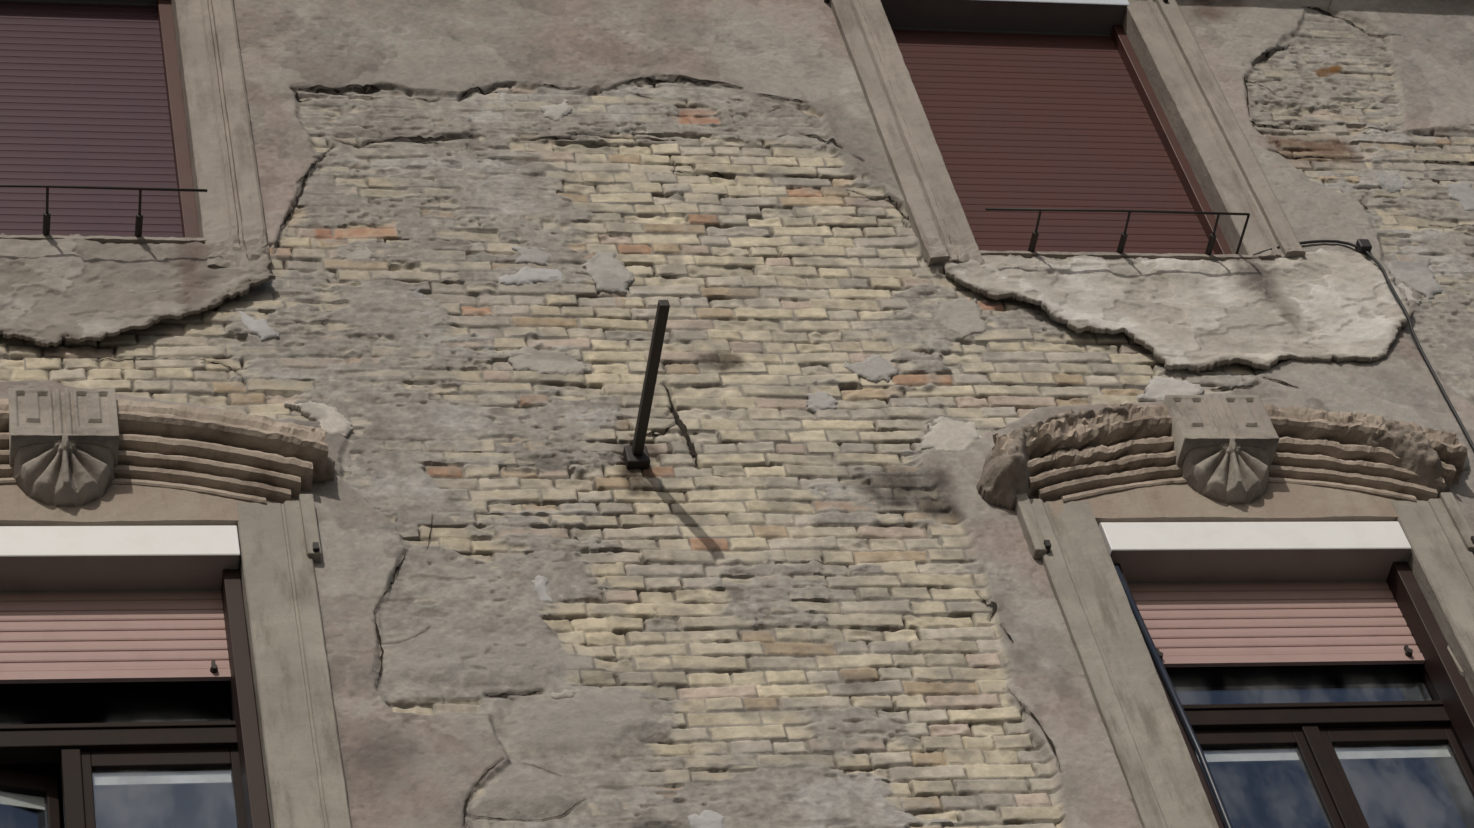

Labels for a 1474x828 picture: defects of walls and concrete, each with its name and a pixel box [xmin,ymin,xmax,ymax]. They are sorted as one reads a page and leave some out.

crack [274,75,909,253]
flaking render [941,6,1474,405]
flaking render [0,74,1265,828]
crack [632,386,699,470]
crack [373,522,432,688]
flaking render [1447,646,1464,677]
crack [463,758,585,828]